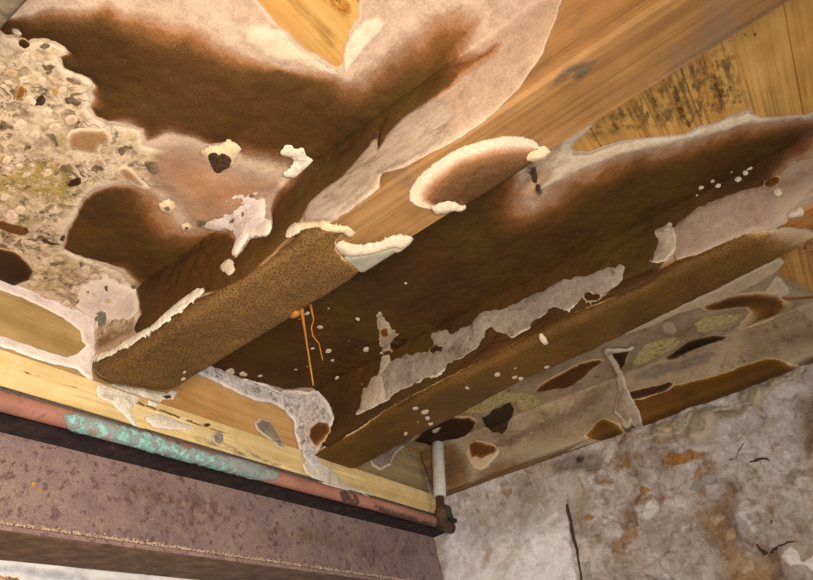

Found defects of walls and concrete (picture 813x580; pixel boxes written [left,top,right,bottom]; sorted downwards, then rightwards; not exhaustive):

damp [330,0,348,13]
spalling [18,37,30,57]
spalling [15,85,25,102]
spalling [35,88,82,106]
damp [609,58,740,133]
damp [304,99,452,221]
spalling [62,177,81,187]
spalling [0,221,29,236]
peeling [764,276,789,297]
spalling [583,291,602,306]
damp [482,403,514,434]
damp [713,408,744,418]